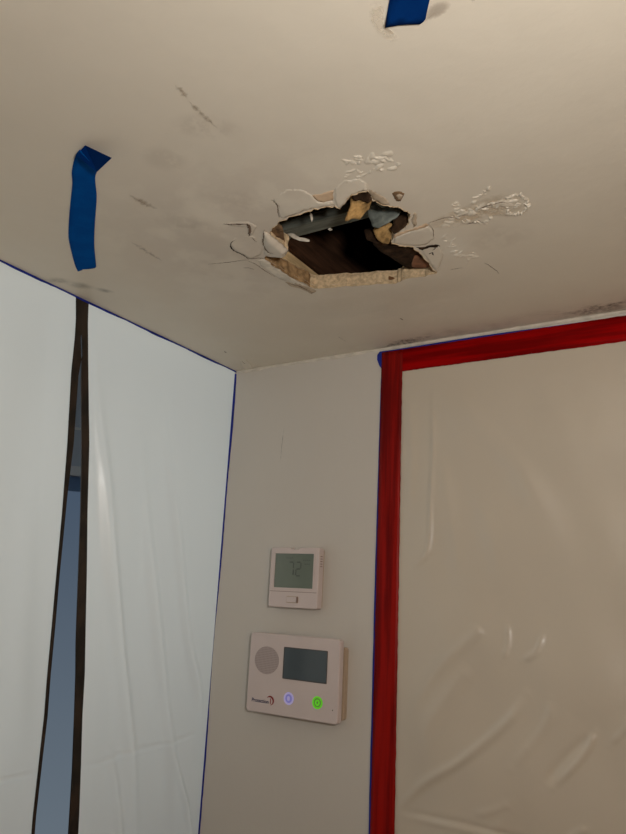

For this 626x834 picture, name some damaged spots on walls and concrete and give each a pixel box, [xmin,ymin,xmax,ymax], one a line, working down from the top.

crack [208,224,313,293]
flaking render [258,179,443,294]